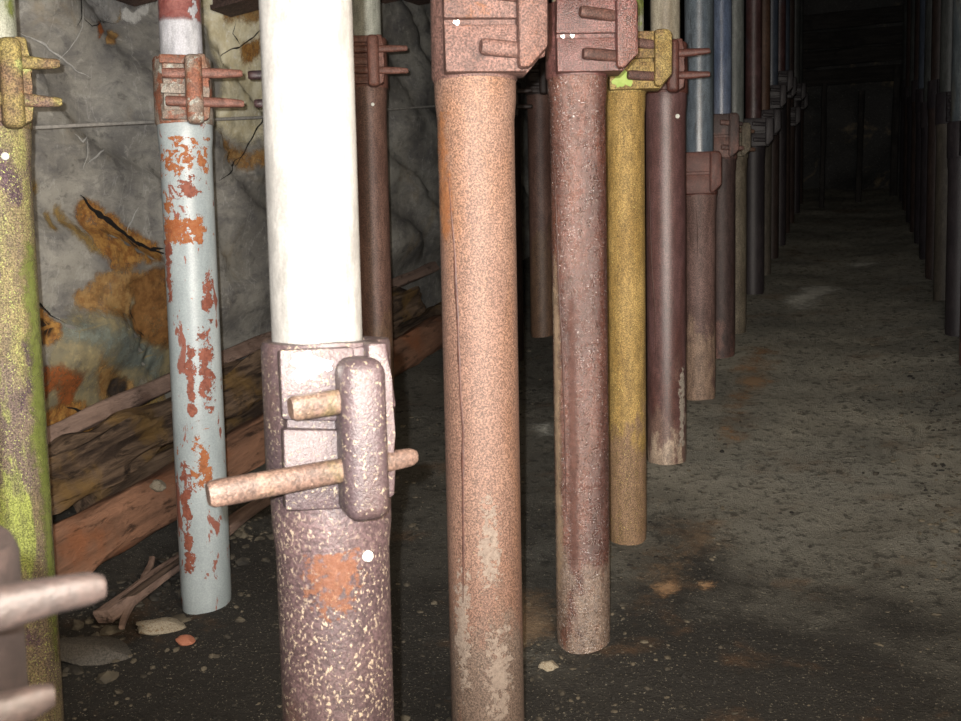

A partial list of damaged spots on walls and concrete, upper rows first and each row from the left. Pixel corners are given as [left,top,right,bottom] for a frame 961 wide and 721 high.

rust [439,111,451,238]
crack [81,195,164,254]
rust [301,547,367,623]